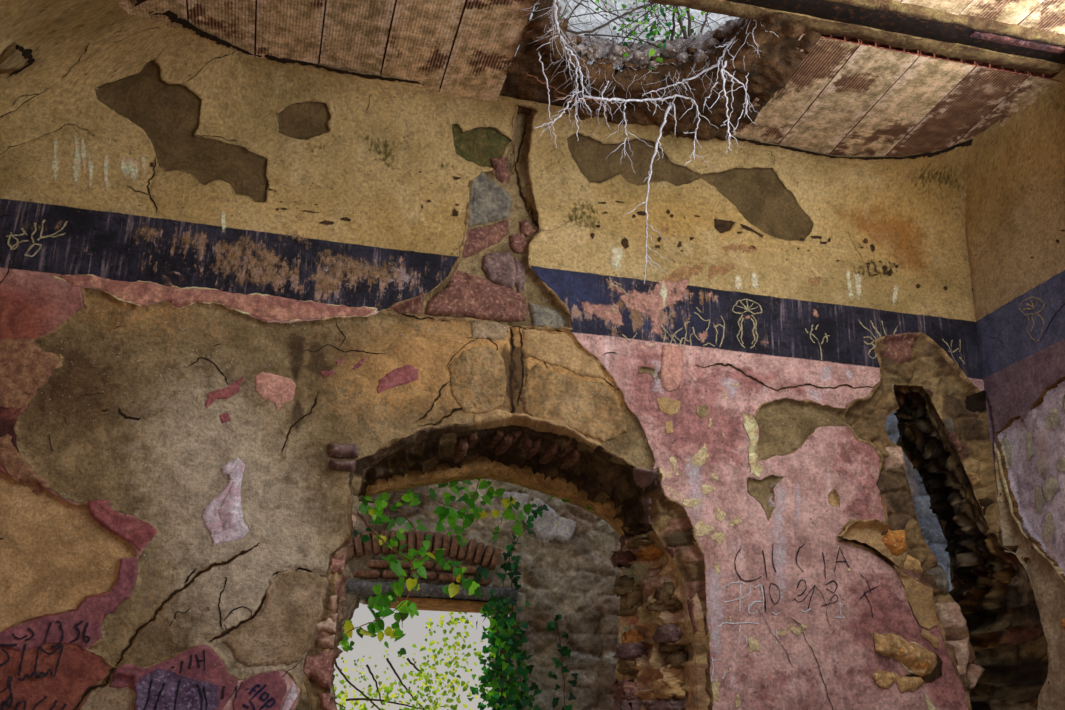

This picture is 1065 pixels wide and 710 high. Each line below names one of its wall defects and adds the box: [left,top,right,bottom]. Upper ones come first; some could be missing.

spalling [558,19,749,70]
spalling [94,60,268,202]
crack [282,394,318,451]
crack [308,318,380,354]
spalling [0,100,742,710]
crack [390,313,570,442]
spalling [567,133,813,433]
spalling [743,398,848,520]
crack [696,332,1049,710]
spalling [994,376,1065,710]
crack [73,543,328,710]
peeling [871,573,943,710]